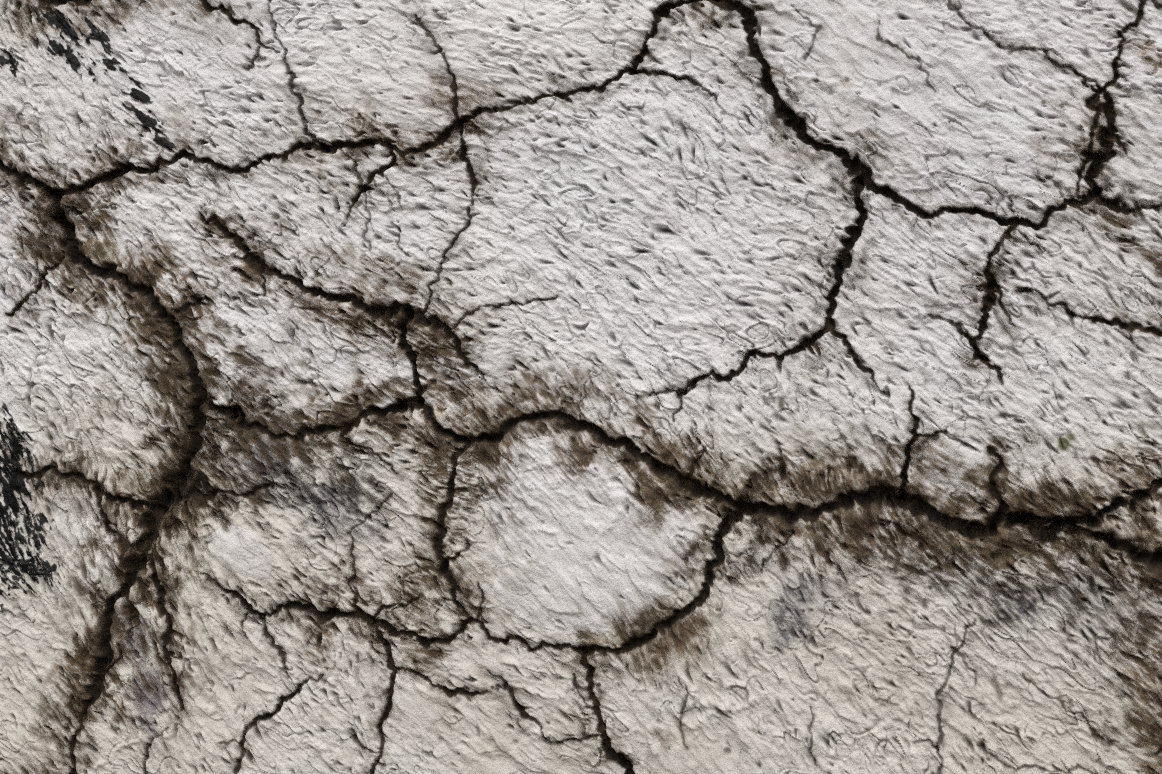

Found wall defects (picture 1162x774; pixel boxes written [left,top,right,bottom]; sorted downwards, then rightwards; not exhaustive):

crack [0,160,45,189]
crack [6,258,64,316]
leakage [127,143,209,183]
leakage [200,211,474,378]
crack [44,0,717,217]
crack [428,139,478,296]
leakage [282,56,637,211]
crack [650,0,1162,421]
crack [17,205,1162,774]
leakage [308,603,454,664]
leakage [553,549,733,672]
leakage [1122,644,1162,774]